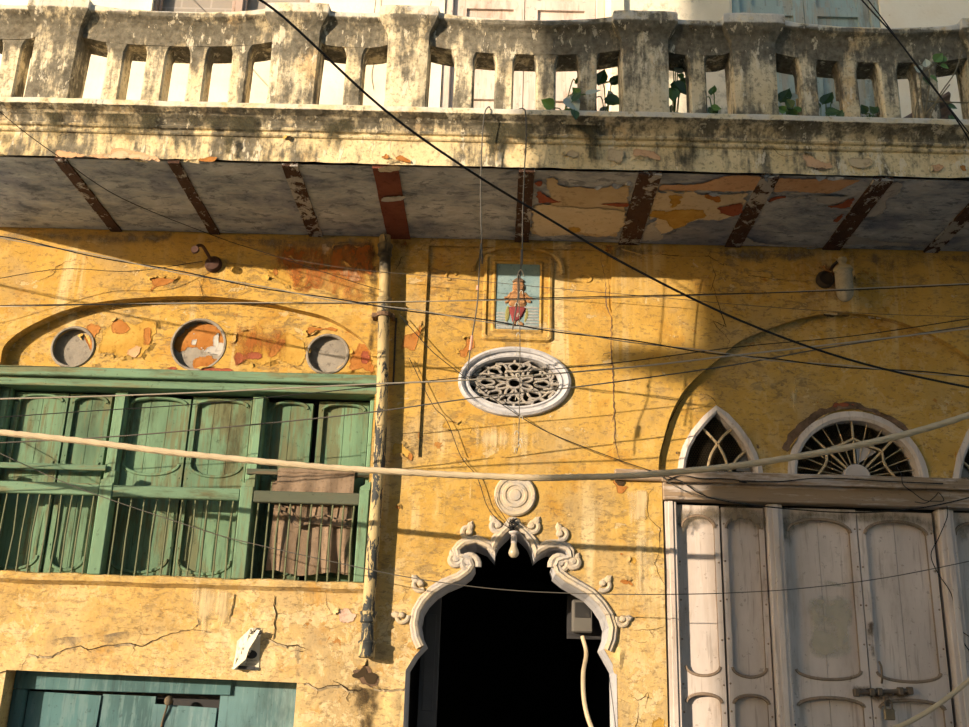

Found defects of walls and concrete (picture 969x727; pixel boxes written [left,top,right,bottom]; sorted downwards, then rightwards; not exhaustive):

spalling [55,148,160,163]
water stain [225,135,234,154]
peeling [530,177,634,237]
peeling [642,151,860,241]
peeling [174,323,337,371]
peeling [337,343,376,375]
crack [0,593,236,673]
water stain [352,686,377,727]